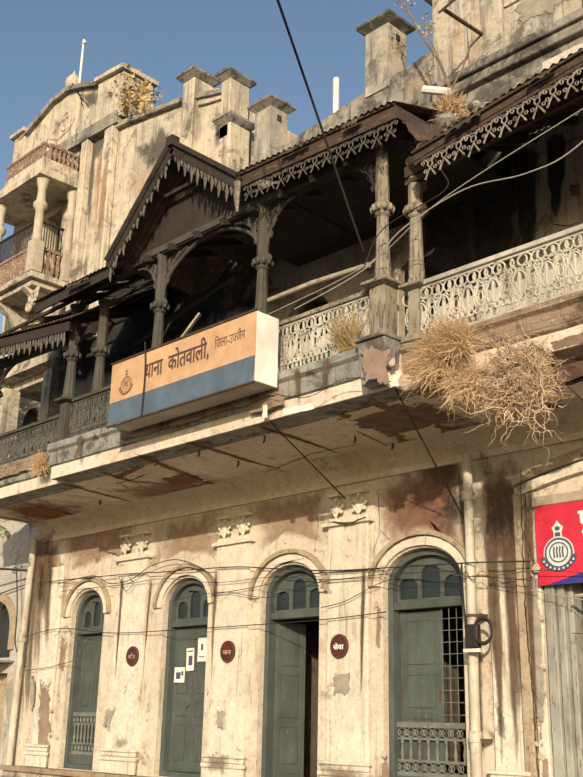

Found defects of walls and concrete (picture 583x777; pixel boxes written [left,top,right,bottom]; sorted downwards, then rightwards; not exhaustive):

leakage [514,146,537,244]
leakage [547,133,565,216]
peeling [360,346,395,385]
leakage [387,456,465,546]
leakage [484,470,536,734]
peeling [30,675,52,752]
peeling [103,706,116,731]
peeling [216,709,226,730]
peeling [330,673,350,696]